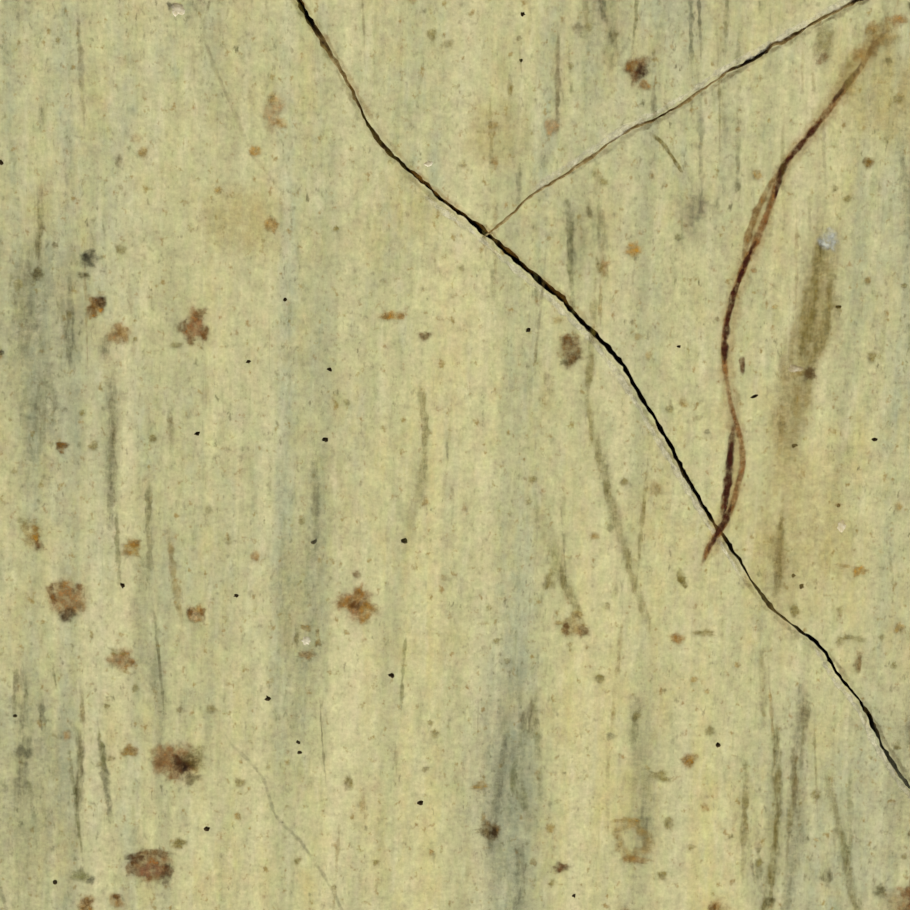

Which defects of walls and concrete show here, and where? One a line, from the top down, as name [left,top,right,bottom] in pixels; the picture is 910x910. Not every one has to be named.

rust [178,310,208,344]
crack [297,0,910,792]
rust [50,583,81,621]
rust [338,586,372,621]
rust [156,745,200,785]
rust [126,839,185,883]